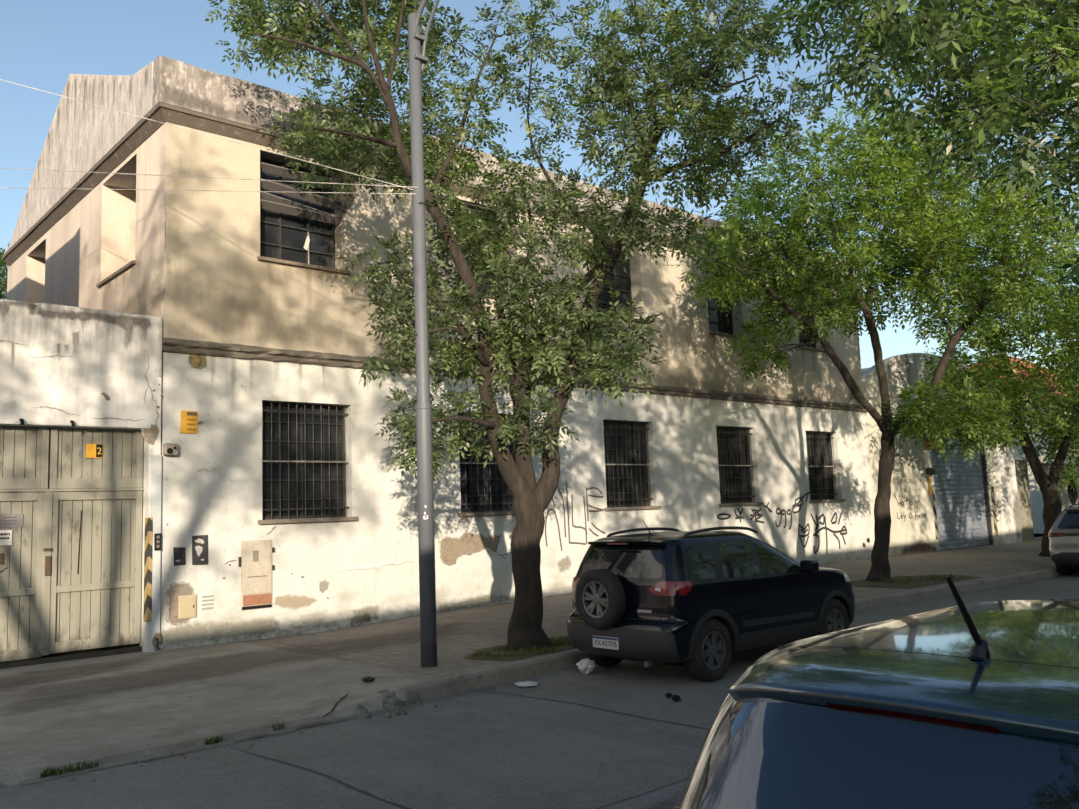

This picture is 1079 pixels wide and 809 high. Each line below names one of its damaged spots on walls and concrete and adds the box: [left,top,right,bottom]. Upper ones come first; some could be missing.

damp [166,89,301,132]
damp [0,301,150,344]
spalling [188,354,207,369]
crack [32,356,159,440]
spalling [439,532,501,566]